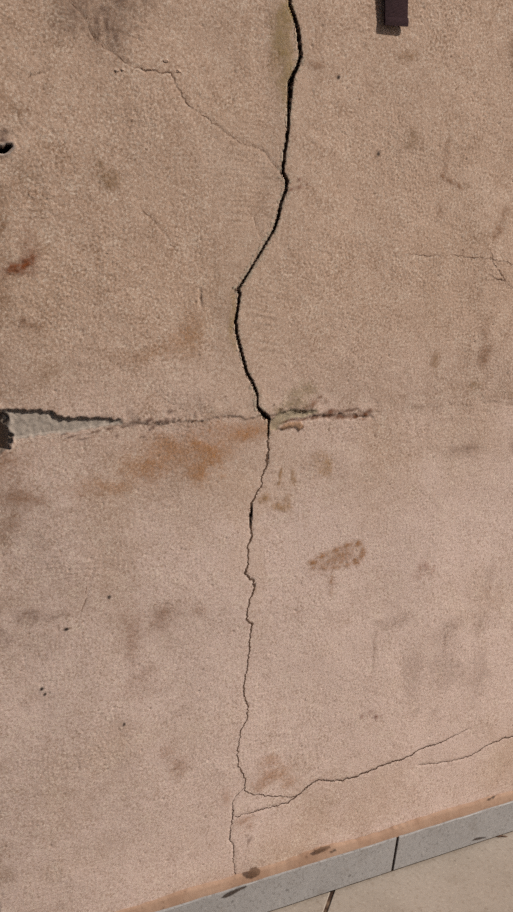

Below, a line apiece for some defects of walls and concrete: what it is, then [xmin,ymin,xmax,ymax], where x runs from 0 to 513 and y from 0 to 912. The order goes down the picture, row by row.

spalling [0,409,122,453]
crack [90,0,513,869]